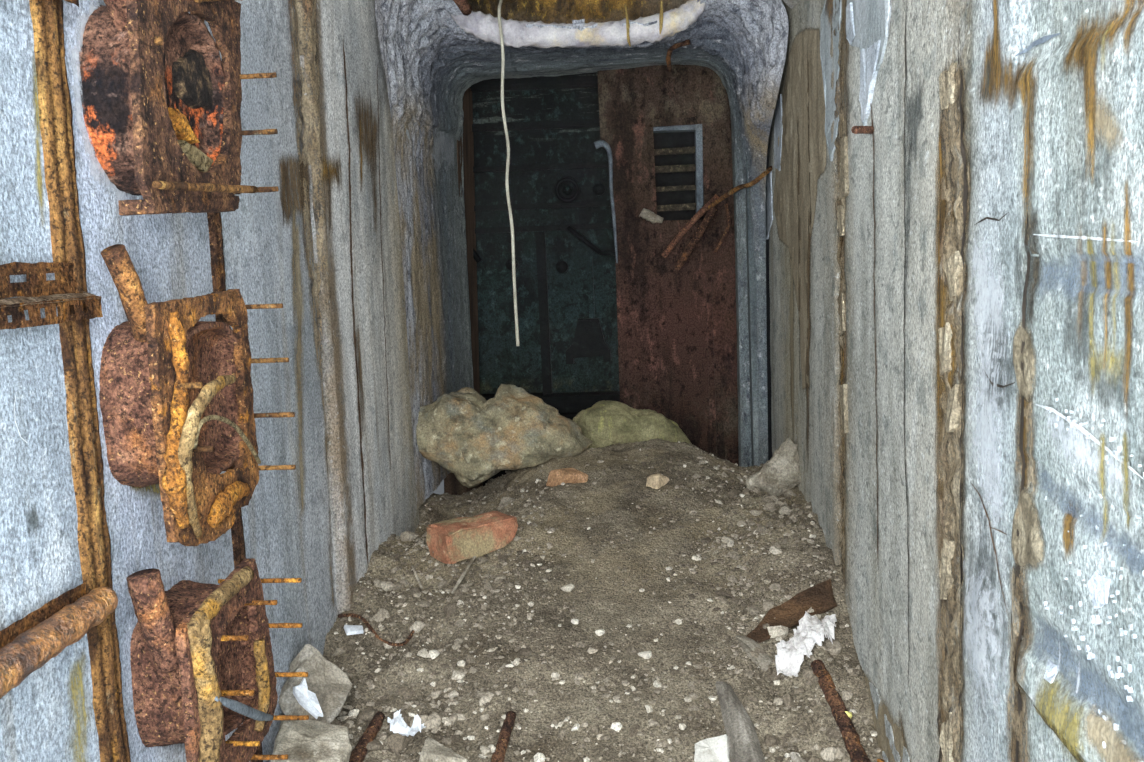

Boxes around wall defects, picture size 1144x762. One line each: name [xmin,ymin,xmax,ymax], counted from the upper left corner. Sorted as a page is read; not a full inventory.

spalling [466,0,689,24]
peeling [939,63,957,110]
rust [980,0,1034,225]
rust [1065,0,1144,177]
flaking render [766,0,892,389]
peeling [943,251,963,301]
peeling [938,322,953,375]
peeling [946,384,962,432]
spalling [1011,488,1047,568]
peeling [1044,542,1137,660]
peeling [1107,656,1133,702]